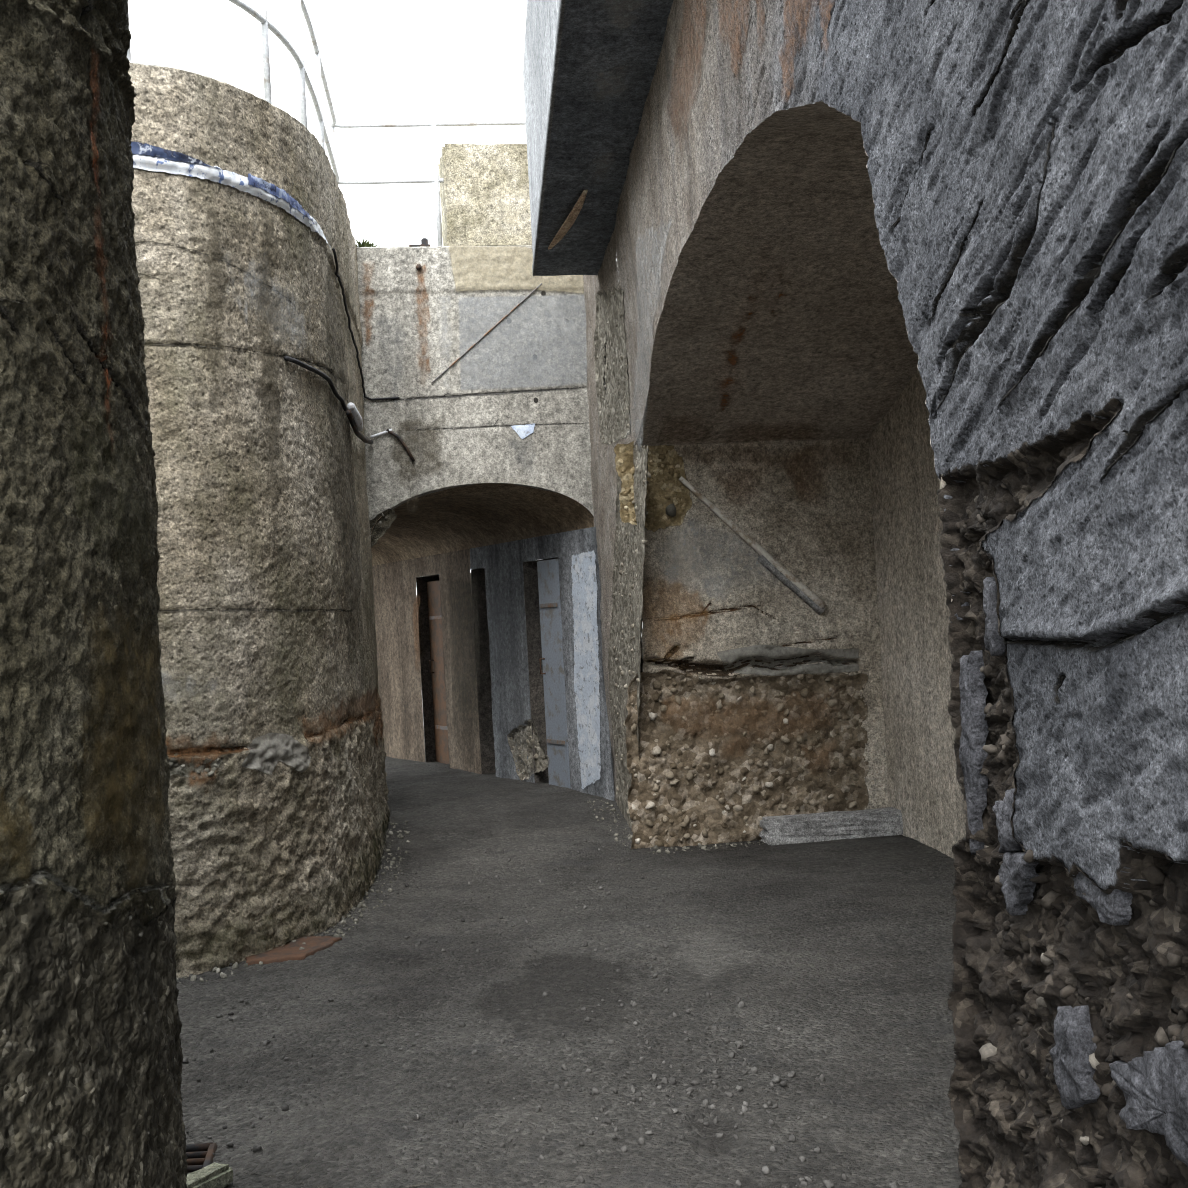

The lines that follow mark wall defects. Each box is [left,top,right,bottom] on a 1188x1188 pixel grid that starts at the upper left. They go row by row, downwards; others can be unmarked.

crack [0,297,27,336]
crack [49,314,147,430]
spalling [571,287,869,849]
spalling [937,383,1188,1188]